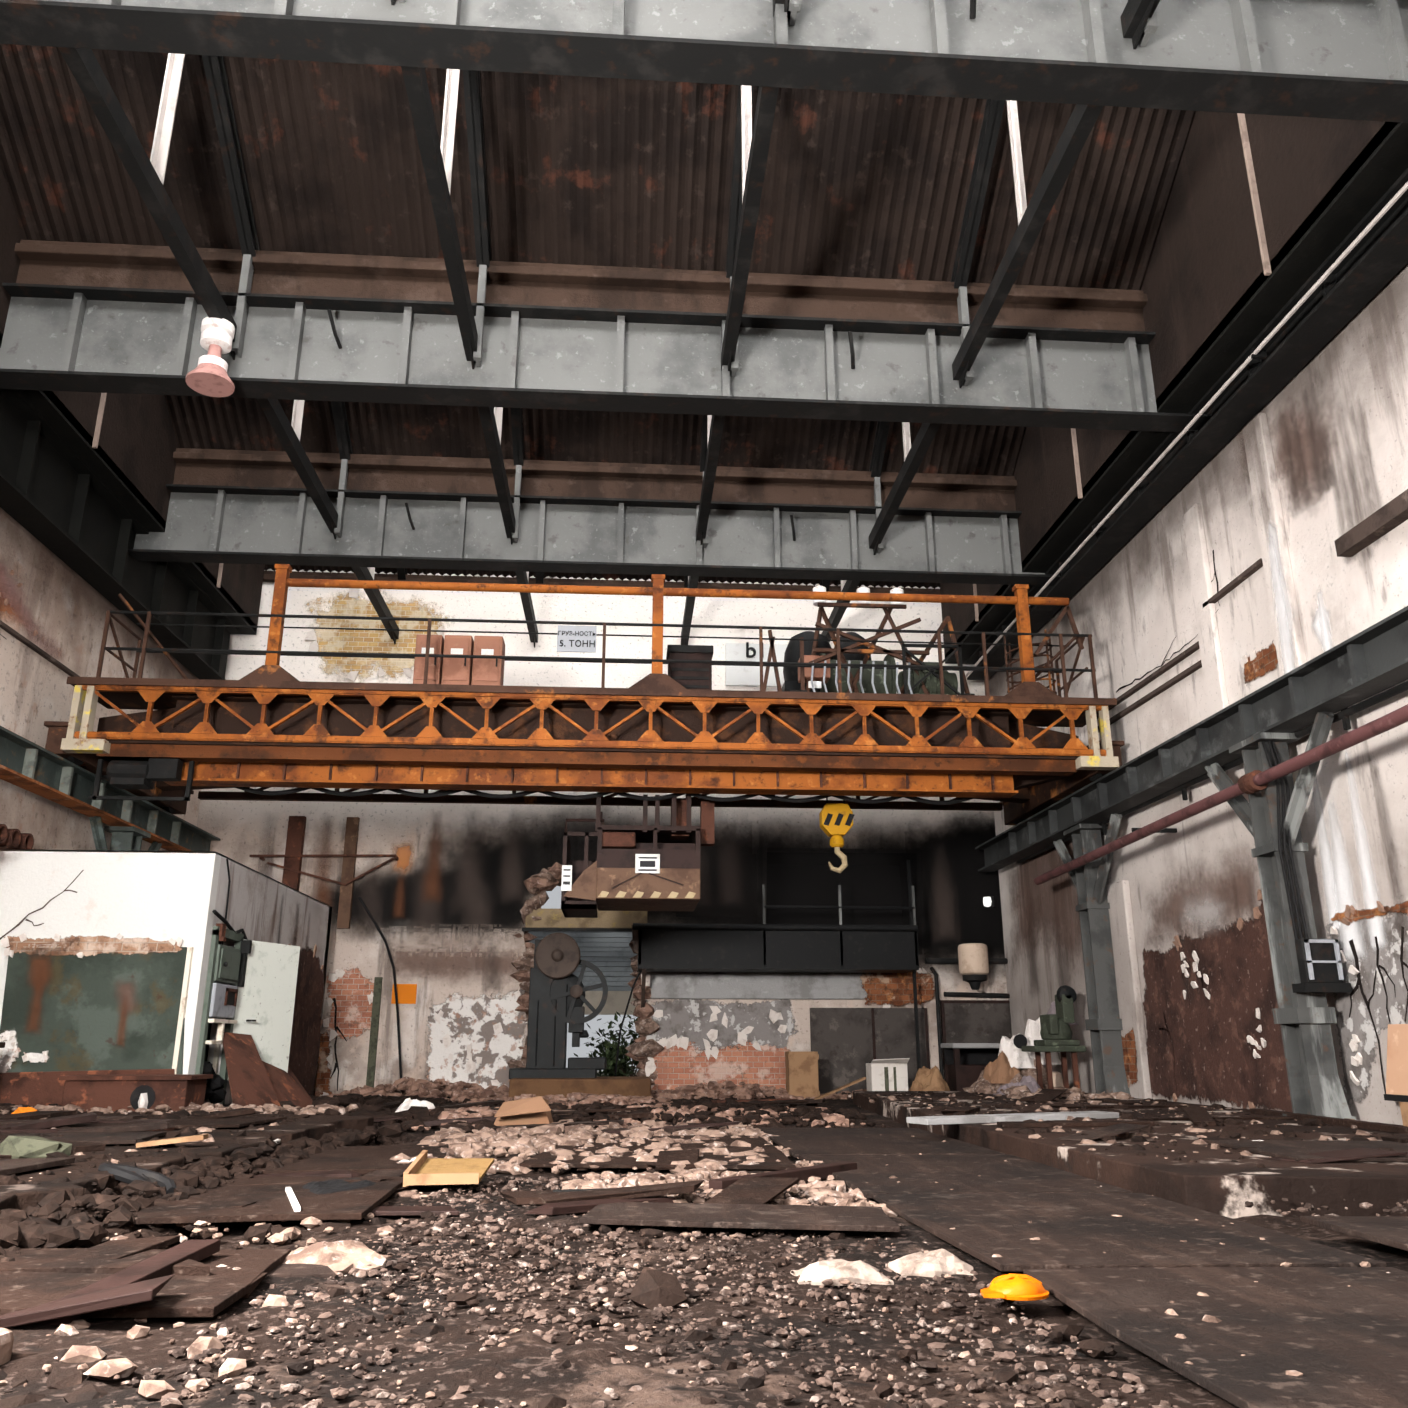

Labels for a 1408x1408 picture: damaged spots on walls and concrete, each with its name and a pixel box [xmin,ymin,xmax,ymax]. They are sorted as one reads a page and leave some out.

water stain [1278,417,1329,497]
flaking render [304,588,447,682]
flaking render [1240,640,1278,684]
peeling [1,933,183,958]
flaking render [288,944,374,1097]
peeling [425,862,562,1090]
peeling [625,938,799,1092]
flaking render [860,967,935,1008]
flaking render [1121,889,1293,1112]
peeling [1326,901,1408,1104]
crack [1349,926,1408,1094]